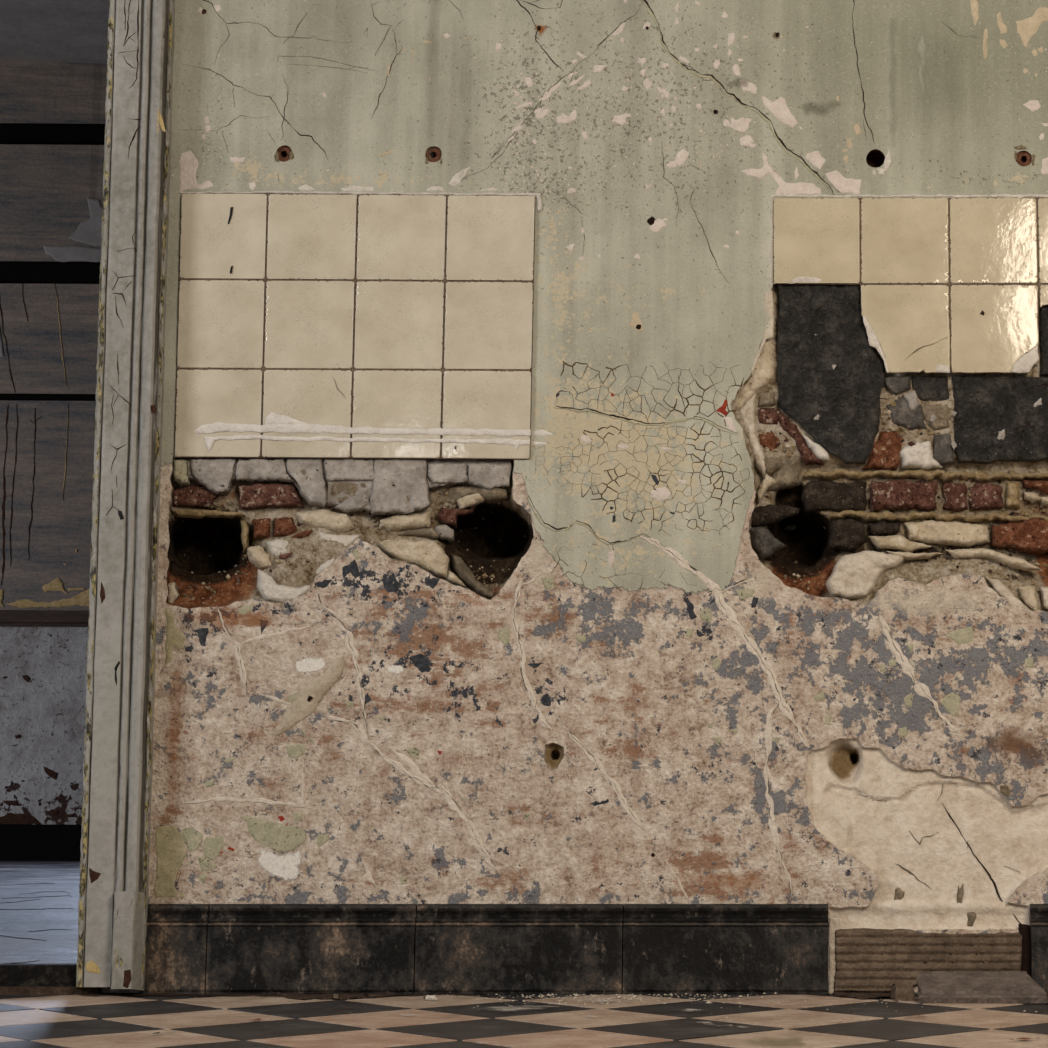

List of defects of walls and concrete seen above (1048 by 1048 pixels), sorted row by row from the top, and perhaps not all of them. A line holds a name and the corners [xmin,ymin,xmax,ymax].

crack [190,0,327,157]
crack [372,2,403,117]
crack [460,0,841,195]
crack [661,142,728,282]
peeling [713,33,803,129]
peeling [723,117,892,195]
crack [852,0,874,142]
flaking render [716,277,1048,612]
flaking render [165,456,534,667]
peeling [387,654,431,684]
crack [512,361,810,902]
flaking render [805,738,1048,994]